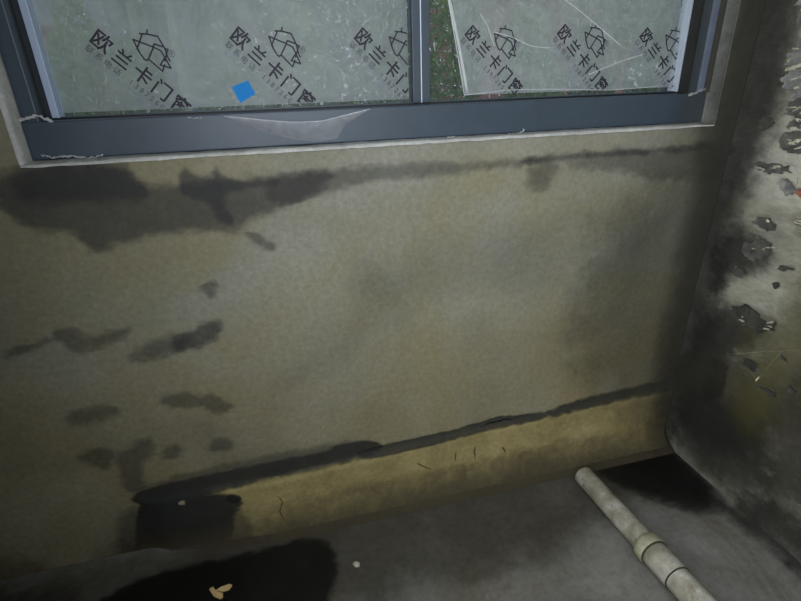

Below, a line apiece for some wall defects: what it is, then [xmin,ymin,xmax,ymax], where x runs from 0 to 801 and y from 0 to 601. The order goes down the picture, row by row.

flaking render [779,37,801,154]
flaking render [755,161,801,198]
damp [132,0,801,550]
flaking render [732,214,777,278]
flaking render [729,304,777,333]
damp [101,539,337,601]